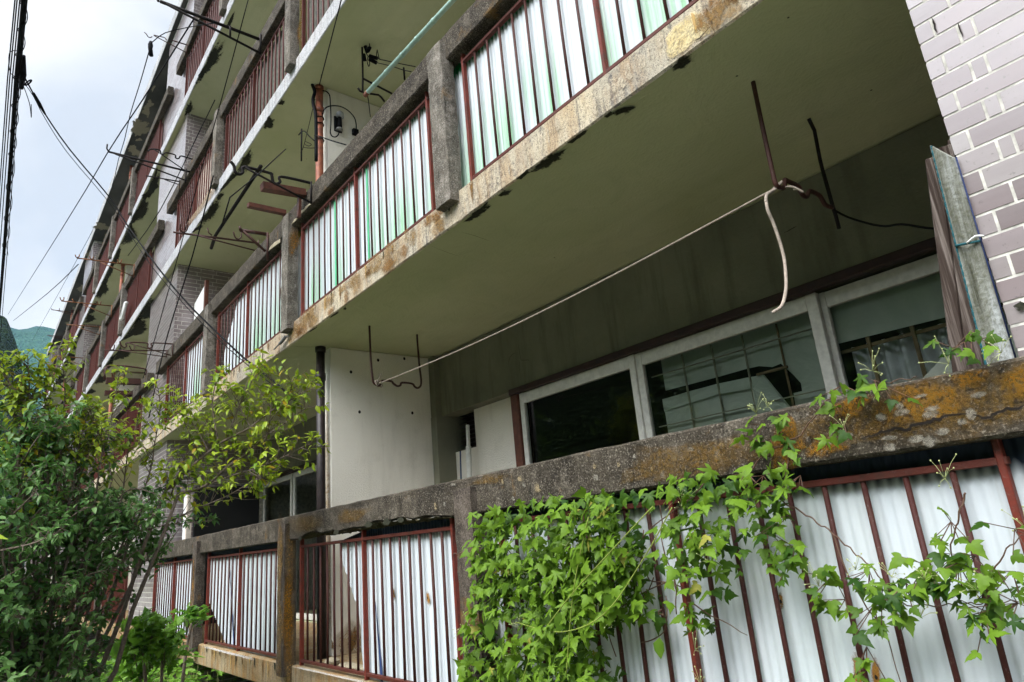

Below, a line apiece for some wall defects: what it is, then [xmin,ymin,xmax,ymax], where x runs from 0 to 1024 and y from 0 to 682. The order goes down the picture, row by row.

peeling [612,12,710,92]
damp [673,54,691,71]
damp [604,106,635,118]
damp [464,130,587,222]
crack [863,405,1024,438]